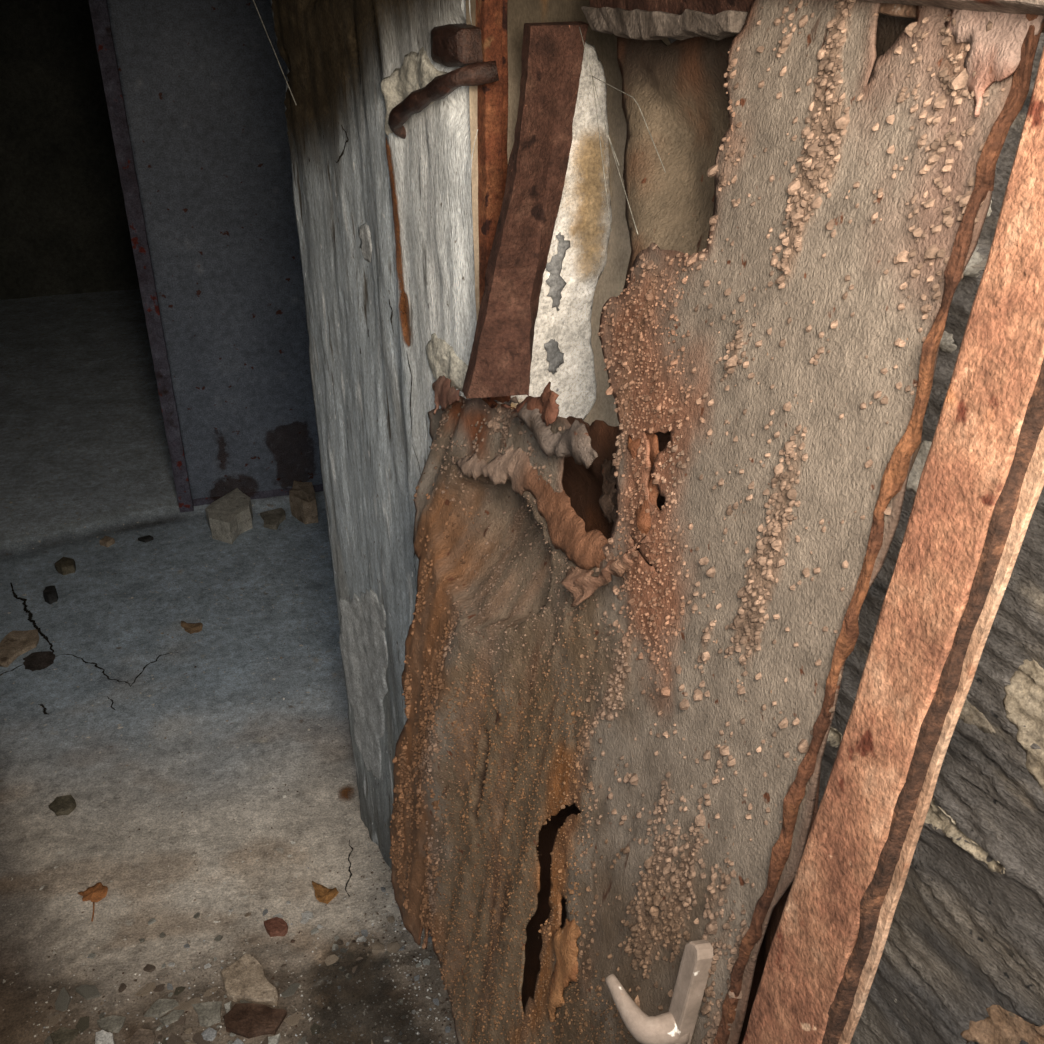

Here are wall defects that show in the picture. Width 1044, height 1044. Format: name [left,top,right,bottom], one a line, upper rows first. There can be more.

corrosion [385,137,411,347]
peeling [494,41,617,523]
corrosion [871,6,1005,343]
corrosion [389,0,864,1044]
peeling [627,432,660,535]
crack [10,582,178,710]
spalling [827,727,842,748]
spalling [1003,658,1044,793]
spalling [924,798,1005,874]